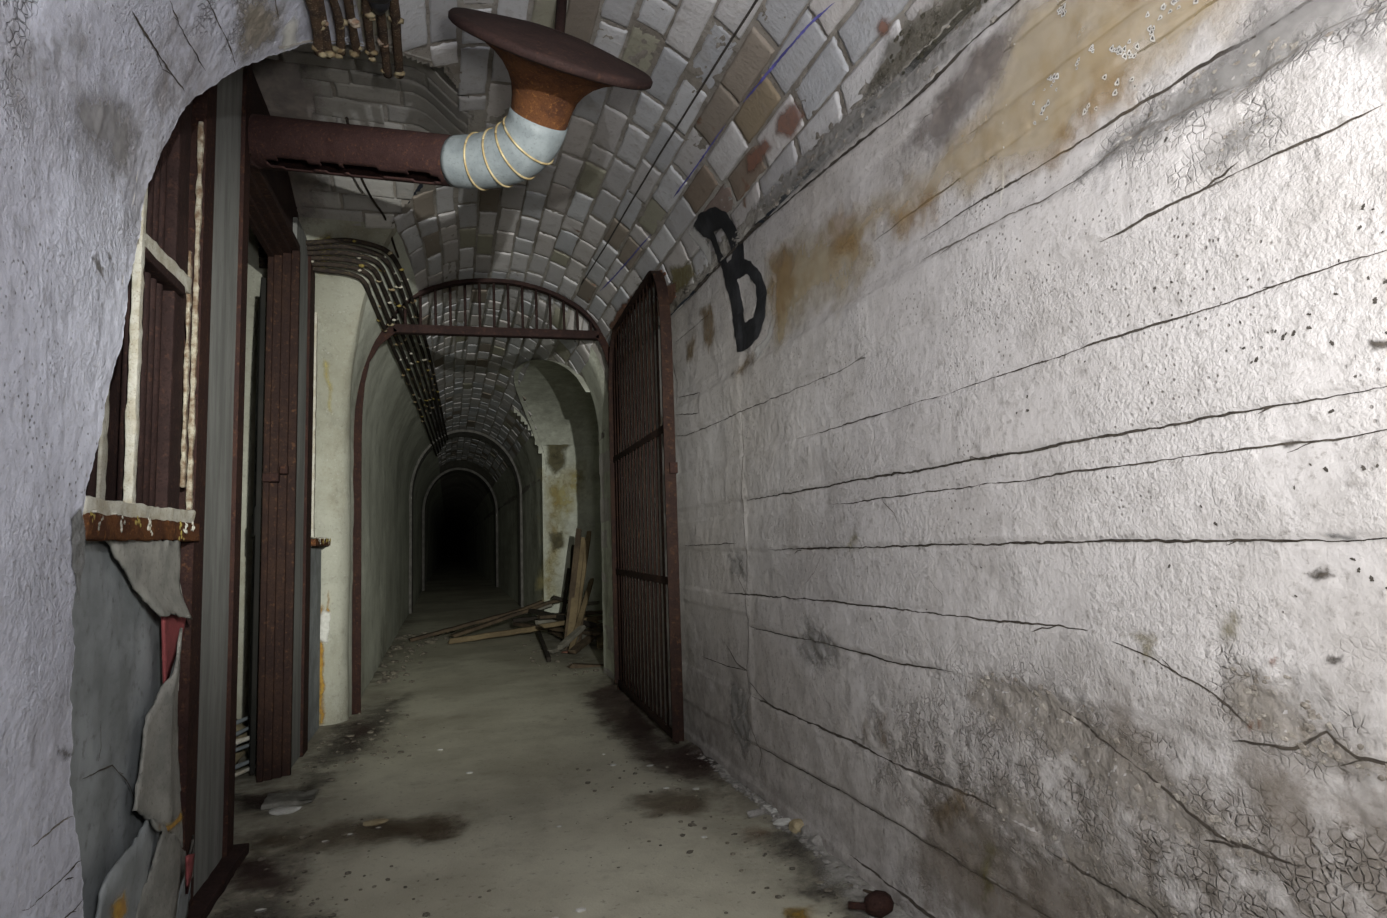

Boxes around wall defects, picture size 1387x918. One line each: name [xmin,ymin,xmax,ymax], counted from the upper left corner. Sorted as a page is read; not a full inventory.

water stain [914,0,1207,192]
water stain [767,206,905,341]
crack [673,0,1387,878]
flaking render [71,509,118,595]
water stain [783,836,913,918]
water stain [930,800,1091,918]